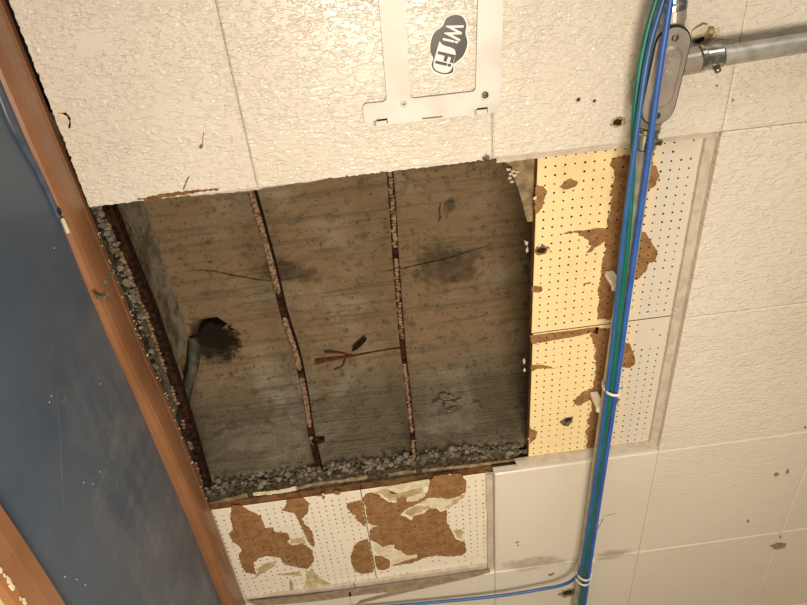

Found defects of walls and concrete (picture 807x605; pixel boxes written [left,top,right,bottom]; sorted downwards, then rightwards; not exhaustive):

spalling [138,176,219,201]
water stain [193,323,239,360]